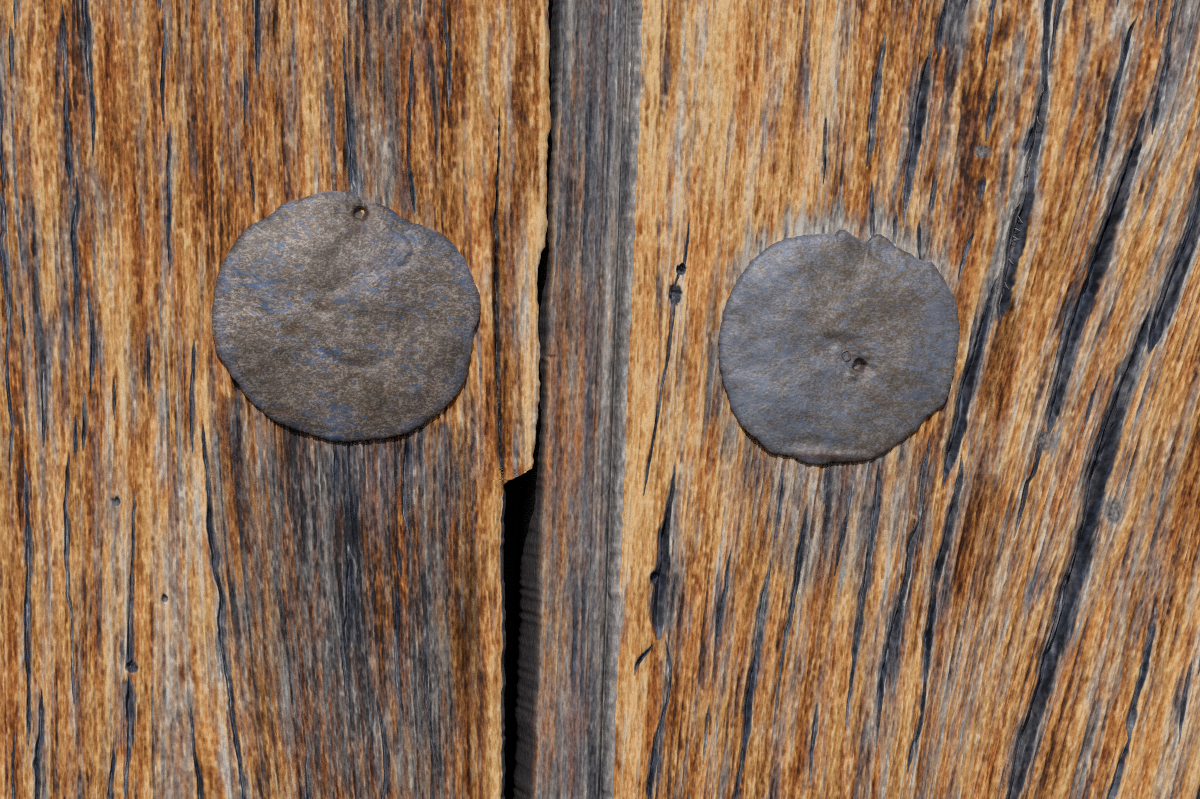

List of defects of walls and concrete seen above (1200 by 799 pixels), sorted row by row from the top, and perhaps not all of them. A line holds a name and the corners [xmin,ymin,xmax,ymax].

crack [494,106,504,483]
crack [634,221,690,799]
crack [702,706,710,764]
crack [717,552,731,636]
crack [733,0,1065,799]